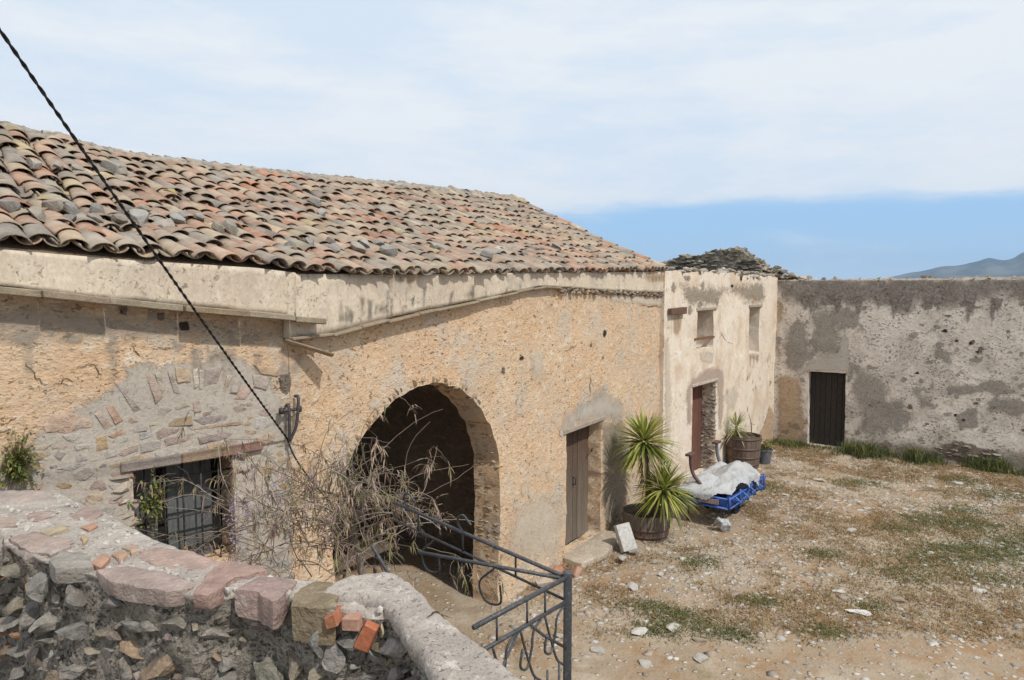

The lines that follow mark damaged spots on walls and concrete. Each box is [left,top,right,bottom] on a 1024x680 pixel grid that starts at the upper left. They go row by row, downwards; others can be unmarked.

crack [25,362,101,386]
peeling [0,355,295,579]
peeling [725,295,864,441]
peeling [847,342,1024,465]